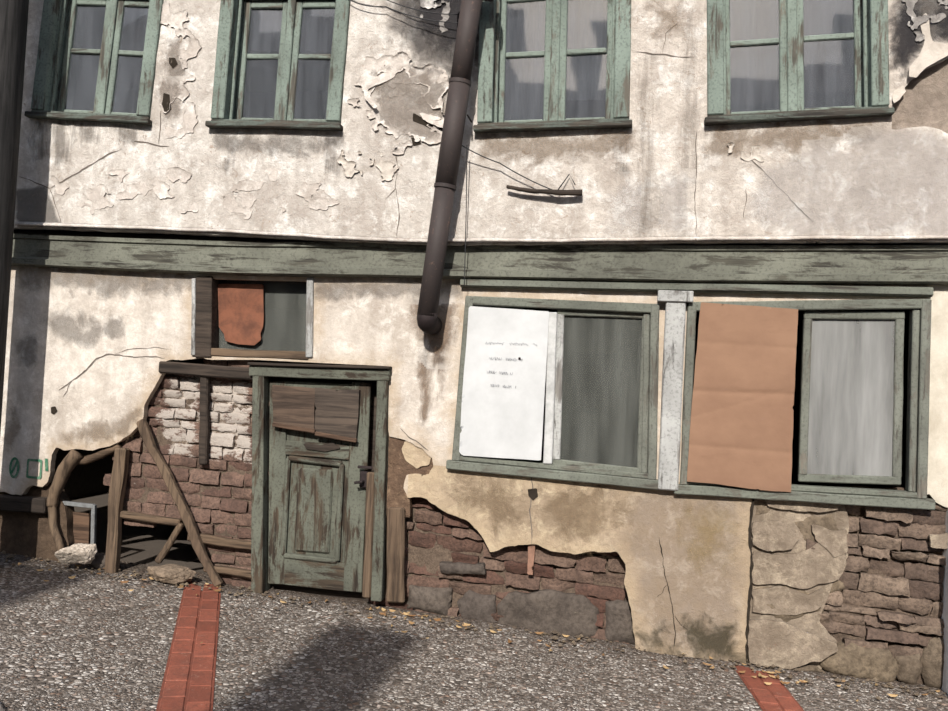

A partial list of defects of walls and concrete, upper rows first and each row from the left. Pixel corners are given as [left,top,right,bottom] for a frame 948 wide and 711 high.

crack [19,112,169,222]
flaking render [76,167,192,215]
flaking render [159,0,201,139]
flaking render [295,181,339,210]
flaking render [337,51,449,181]
flaking render [420,0,450,33]
flaking render [892,0,948,133]
crack [59,347,164,395]
flaking render [0,358,256,588]
flaking render [368,436,635,645]
crack [657,540,685,651]
flaking render [747,494,948,689]